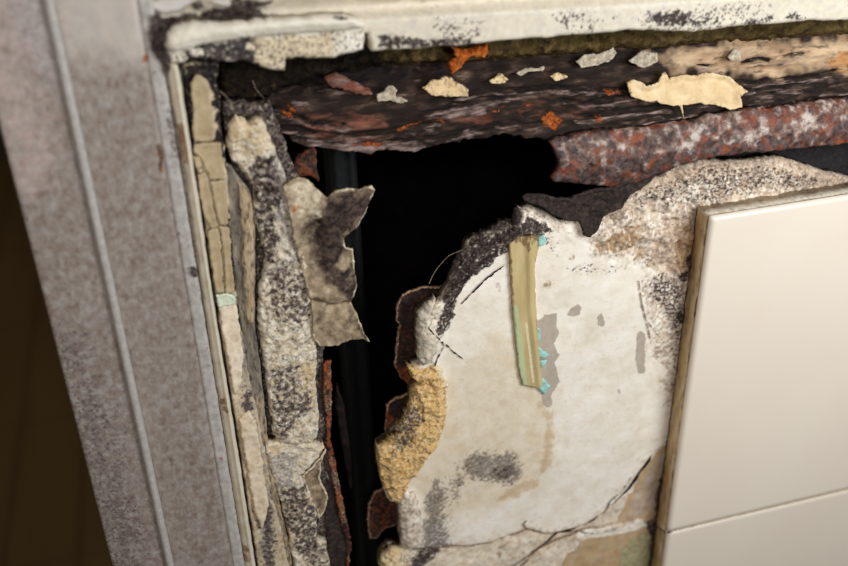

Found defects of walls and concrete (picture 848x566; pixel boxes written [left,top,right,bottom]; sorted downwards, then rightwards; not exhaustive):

water stain [147,0,278,76]
water stain [378,34,471,49]
peeling [422,76,468,97]
water stain [650,9,719,27]
peeling [626,71,748,118]
corrosion [542,96,848,187]
peeling [190,73,236,308]
corrosion [384,284,442,431]
spalling [356,134,607,503]
corrosion [317,358,352,566]
corrosion [366,487,396,539]
crack [432,456,651,566]